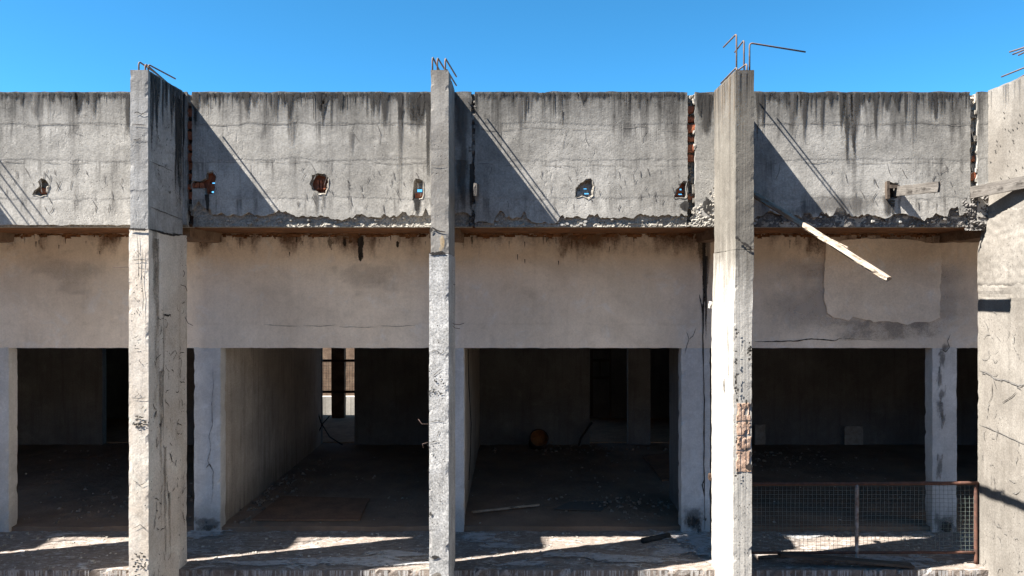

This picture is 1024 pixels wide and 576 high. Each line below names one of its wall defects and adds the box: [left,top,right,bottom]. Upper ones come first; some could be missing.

leakage [0,92,130,132]
leakage [150,73,431,199]
leakage [456,71,746,207]
leakage [756,92,969,159]
spalling [32,178,49,197]
flaking render [183,171,431,227]
flaking render [454,178,714,227]
leakage [698,242,710,328]
flaking render [754,193,989,325]
crack [755,336,876,344]
flaking render [734,342,753,481]
crack [979,311,1024,573]